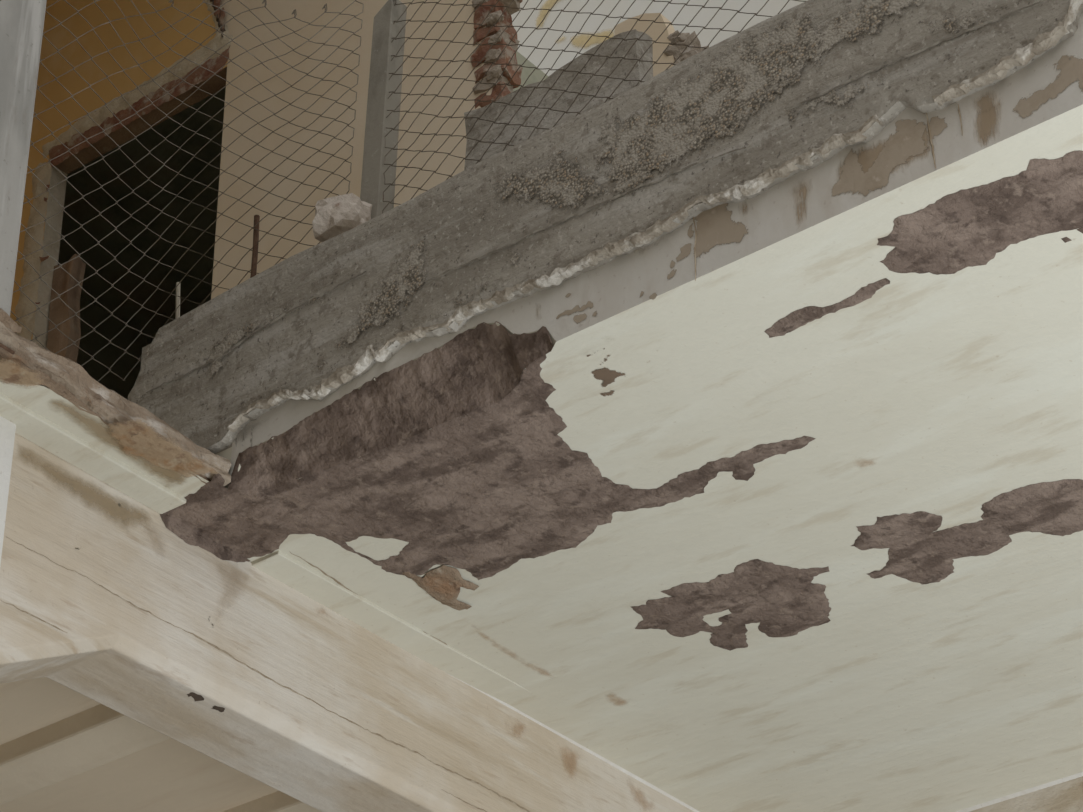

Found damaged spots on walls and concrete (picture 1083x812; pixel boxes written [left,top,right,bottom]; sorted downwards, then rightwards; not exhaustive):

flaking render [49,46,230,167]
spalling [470,0,523,109]
peeling [831,117,947,196]
peeling [1012,55,1083,118]
spalling [250,215,260,278]
peeling [667,203,748,279]
flaking render [765,151,1083,338]
peeling [556,293,597,323]
flaking render [0,308,815,611]
flaking render [852,479,1083,585]
flaking render [631,559,831,651]
crack [1,537,530,812]